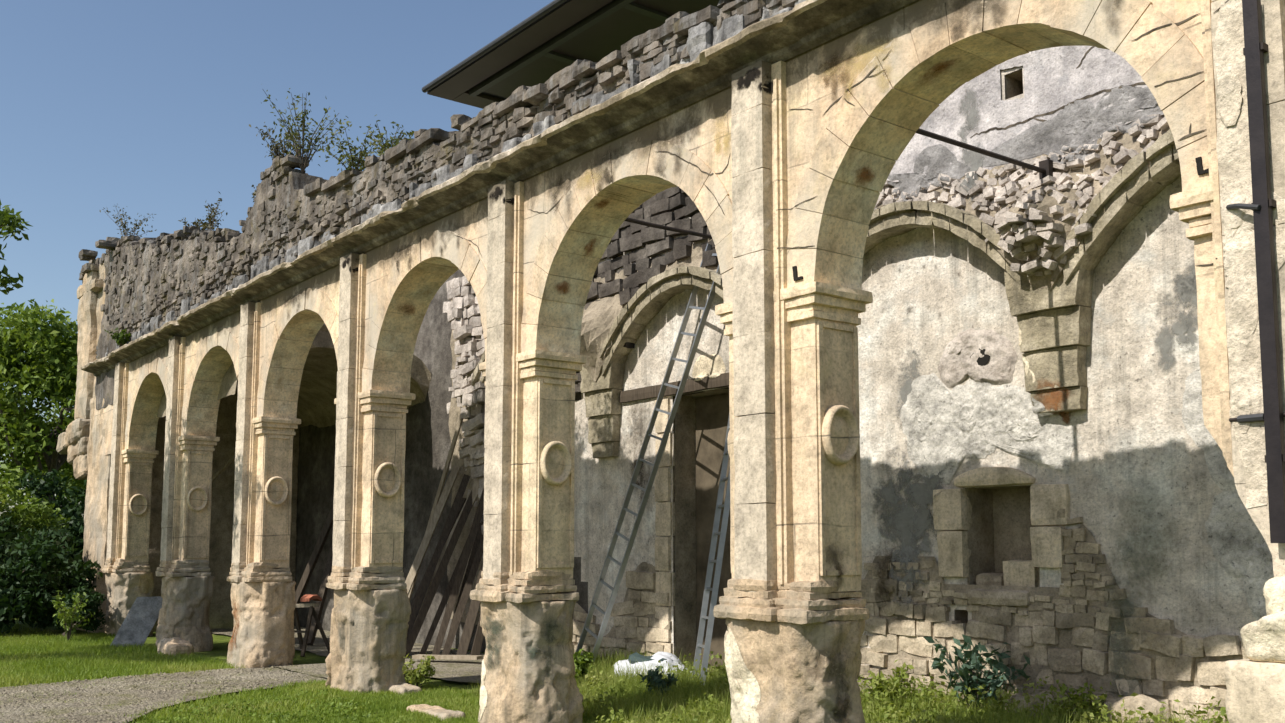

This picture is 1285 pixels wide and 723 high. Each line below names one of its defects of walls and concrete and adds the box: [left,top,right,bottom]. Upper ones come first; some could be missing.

crack [1132,0,1229,41]
crack [789,49,892,115]
crack [970,46,1204,138]
crack [654,151,730,215]
rust [858,168,872,180]
flaking render [888,85,1164,201]
crack [1178,123,1207,141]
water stain [1155,263,1198,371]
peeling [900,329,1077,485]
rust [1039,383,1069,424]
water stain [485,617,503,668]